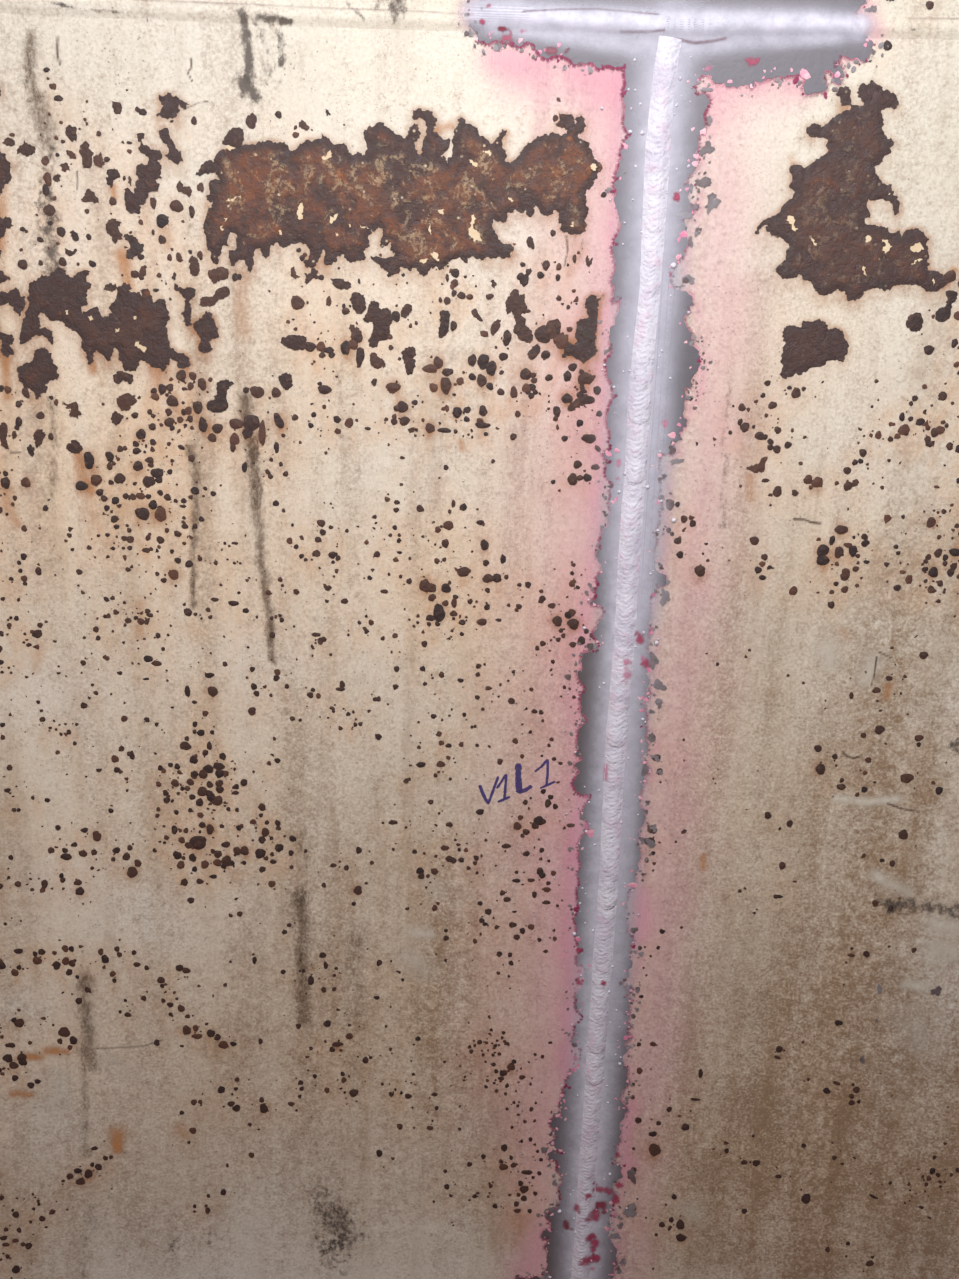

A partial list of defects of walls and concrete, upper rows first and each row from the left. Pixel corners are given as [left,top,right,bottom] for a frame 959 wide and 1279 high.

corrosion [713,80,959,506]
corrosion [0,67,607,756]
corrosion [662,492,696,558]
corrosion [750,536,774,580]
corrosion [789,503,959,609]
corrosion [85,746,140,792]
corrosion [403,659,566,783]
corrosion [814,646,907,797]
corrosion [381,781,575,995]
corrosion [0,939,237,1049]
corrosion [0,1009,84,1096]
corrosion [0,1184,68,1279]